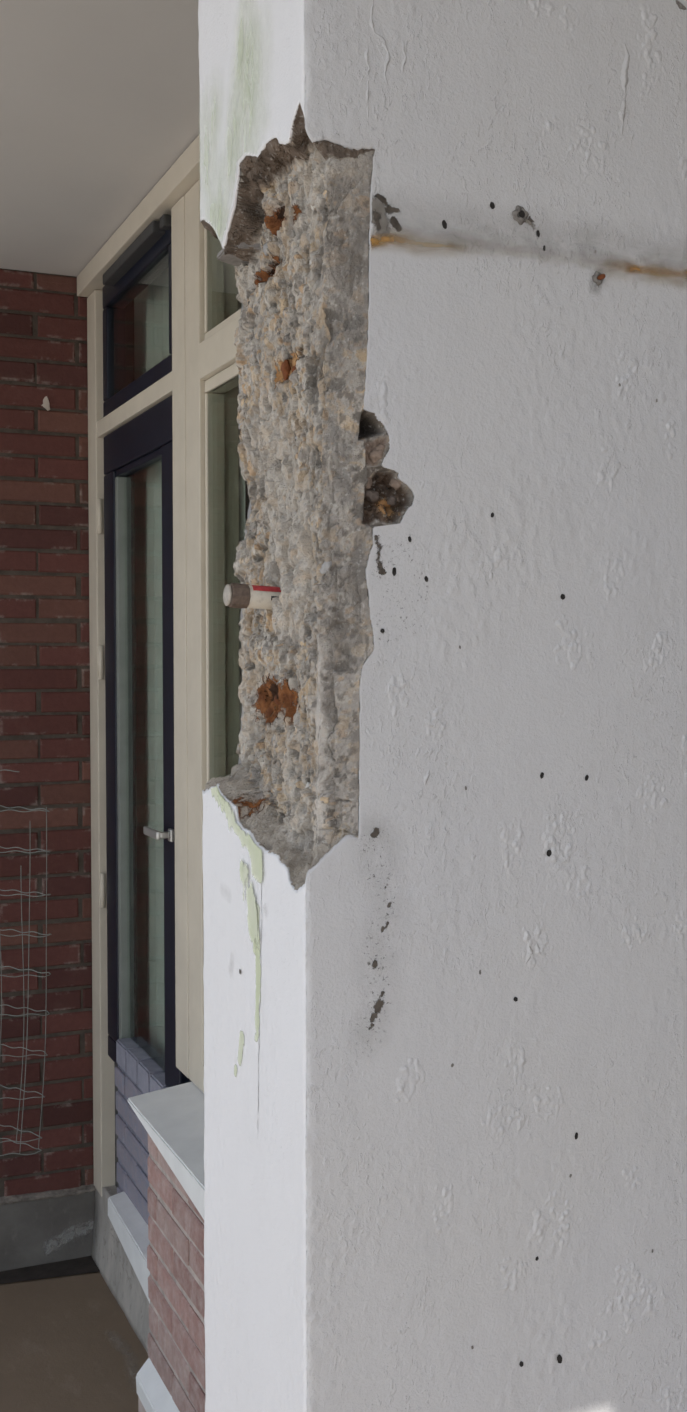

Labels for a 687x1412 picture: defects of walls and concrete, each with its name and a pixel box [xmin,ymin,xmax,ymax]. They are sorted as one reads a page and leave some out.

rust [264,202,302,236]
rust [254,256,282,287]
spalling [201,104,414,1076]
rust [248,674,301,728]